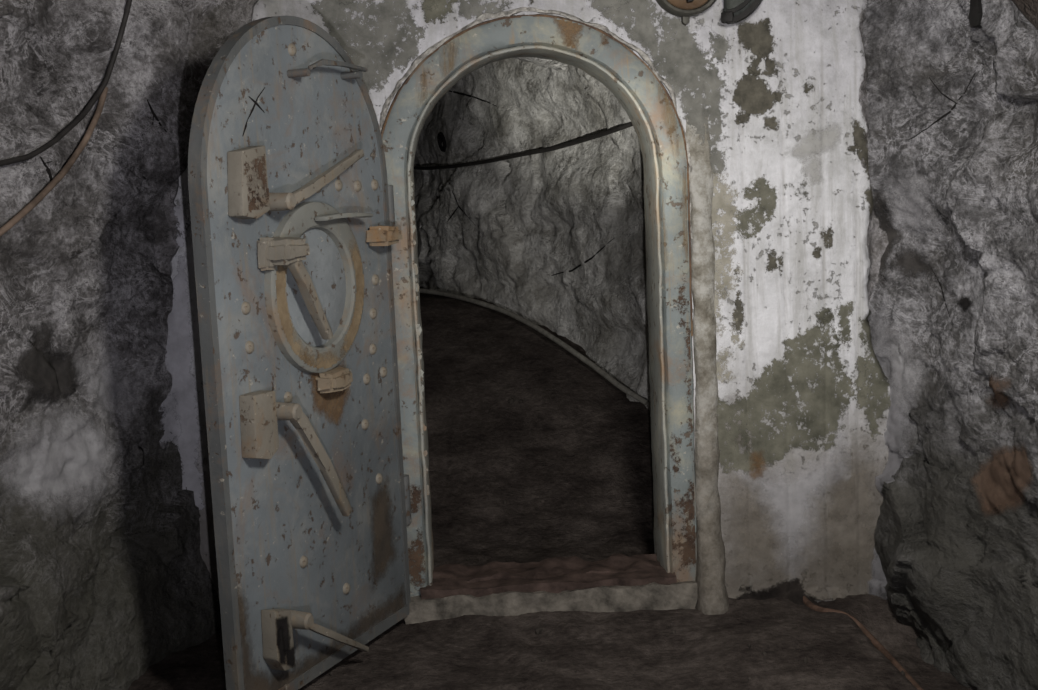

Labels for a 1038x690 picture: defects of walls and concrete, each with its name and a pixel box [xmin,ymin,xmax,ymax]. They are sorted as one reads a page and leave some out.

peeling [310,0,513,93]
crack [908,73,975,140]
peeling [586,0,811,383]
corrosion [670,409,693,474]
peeling [717,301,909,497]
corrosion [672,481,696,573]
peeling [870,547,887,597]